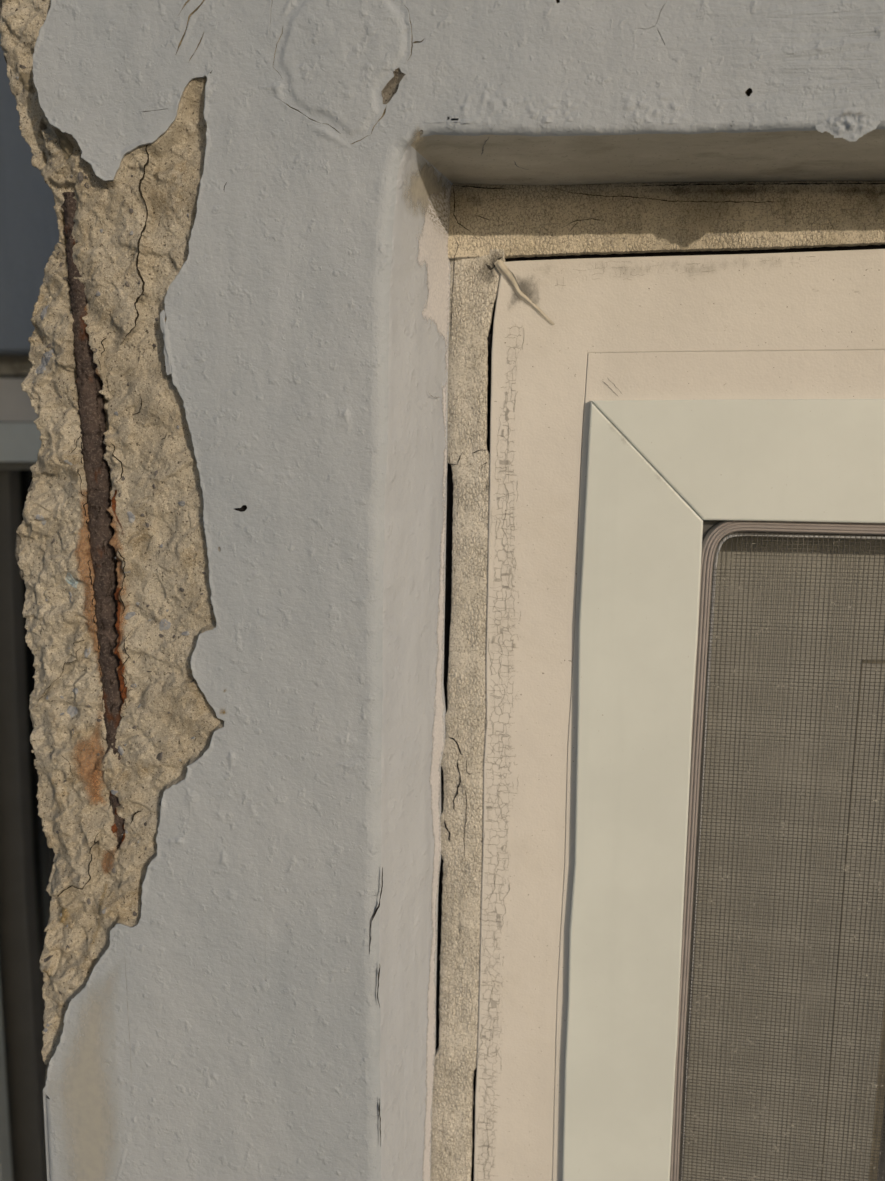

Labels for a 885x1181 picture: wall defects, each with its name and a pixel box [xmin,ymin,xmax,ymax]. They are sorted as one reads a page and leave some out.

crack [175,0,212,75]
crack [273,28,387,144]
crack [393,0,425,65]
rust [76,490,127,713]
spalling [0,0,226,1091]
rust [77,732,103,802]
crack [436,303,524,1181]
rust [102,807,125,873]